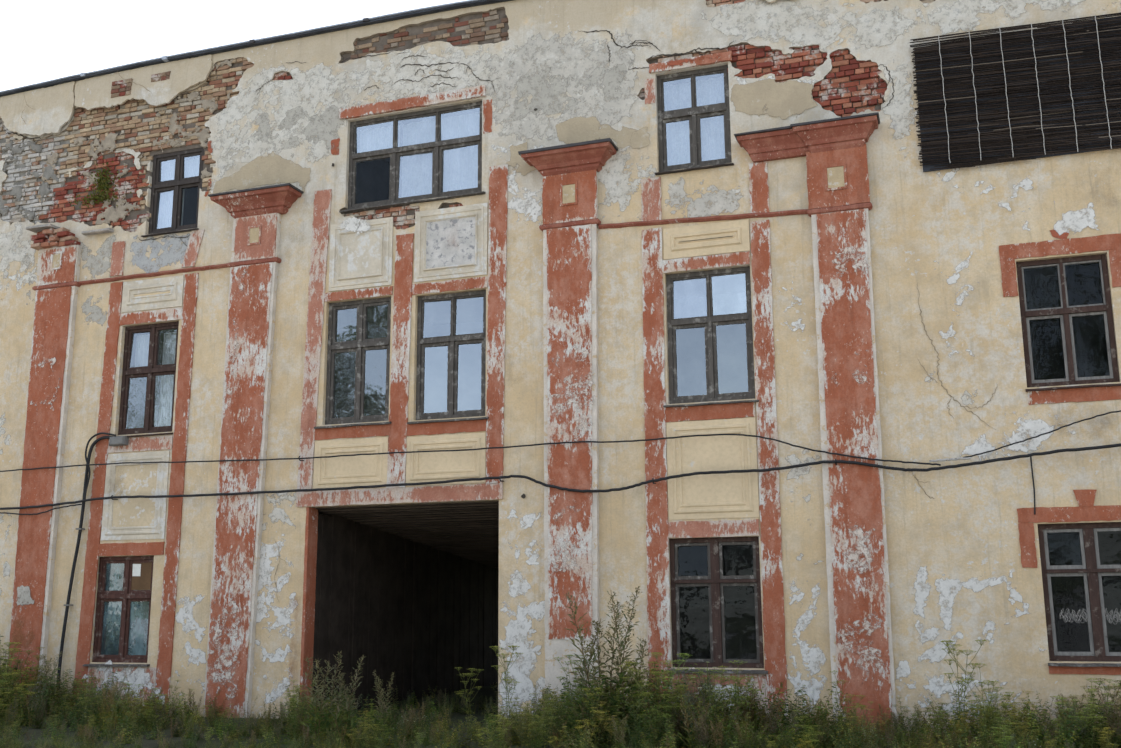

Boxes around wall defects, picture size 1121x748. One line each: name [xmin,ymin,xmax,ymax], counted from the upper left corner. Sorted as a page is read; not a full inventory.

crack [339,51,499,90]
flaking render [0,0,1084,305]
peeling [1054,202,1098,235]
peeling [549,345,595,441]
crack [917,283,996,430]
peeling [960,410,1076,461]
peeling [175,595,240,700]
peeling [255,492,298,703]
peeling [499,506,579,718]
peeling [844,525,875,574]
peeling [837,614,883,683]
peeling [896,566,1029,719]